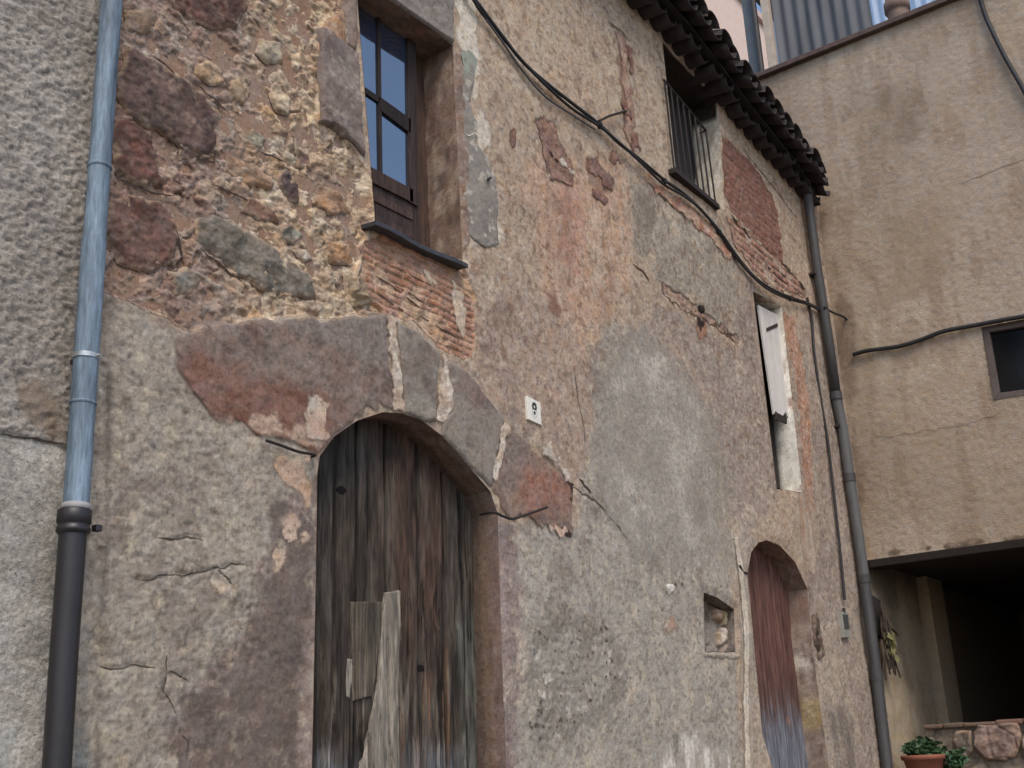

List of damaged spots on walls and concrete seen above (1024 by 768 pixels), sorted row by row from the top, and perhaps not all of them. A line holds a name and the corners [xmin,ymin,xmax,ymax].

peeling [454,0,491,150]
spalling [104,0,476,360]
spalling [536,116,622,205]
spalling [644,138,806,299]
spalling [662,283,739,345]
crack [158,533,202,541]
crack [139,563,245,585]
flaking render [272,456,312,573]
flaking render [543,441,574,502]
flaking render [549,525,572,537]
crack [574,479,630,543]
crack [98,655,189,752]